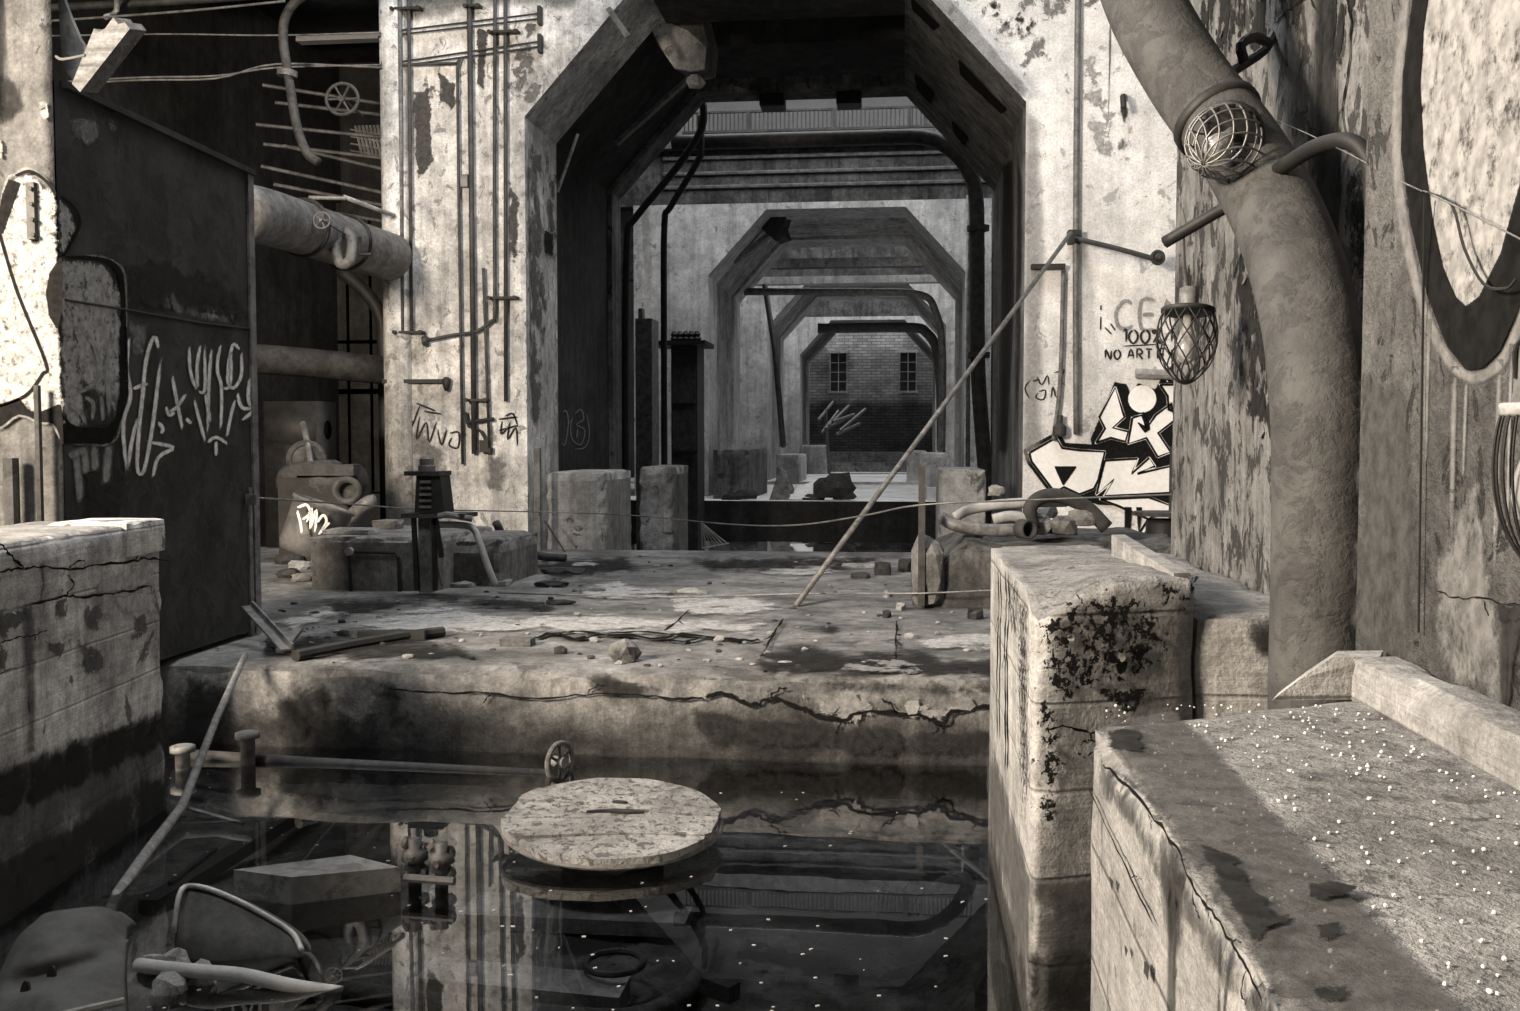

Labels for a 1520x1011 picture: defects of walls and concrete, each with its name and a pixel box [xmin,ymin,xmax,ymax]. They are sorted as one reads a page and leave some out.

spalling [911,0,940,30]
spalling [958,60,1007,114]
peeling [967,0,1098,76]
peeling [1064,55,1132,160]
crack [0,543,168,674]
water stain [263,555,782,659]
water stain [679,555,880,579]
water stain [0,599,233,933]
water stain [246,677,467,754]
crack [388,571,1012,768]
water stain [693,709,1091,1011]
crack [1046,725,1262,1006]